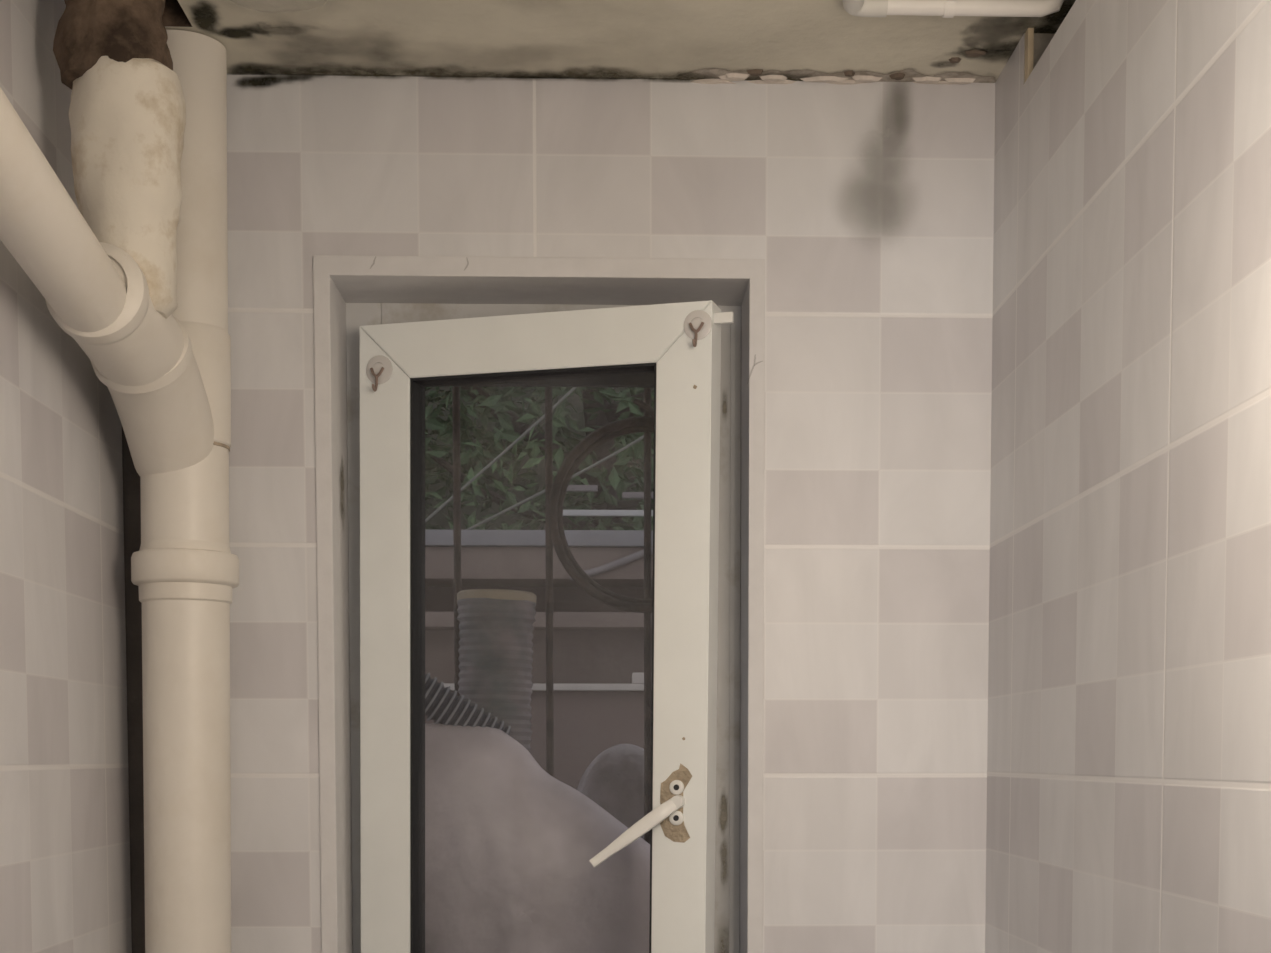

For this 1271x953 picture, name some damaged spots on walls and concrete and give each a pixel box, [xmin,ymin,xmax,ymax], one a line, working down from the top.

damp [193,3,300,38]
damp [230,65,709,87]